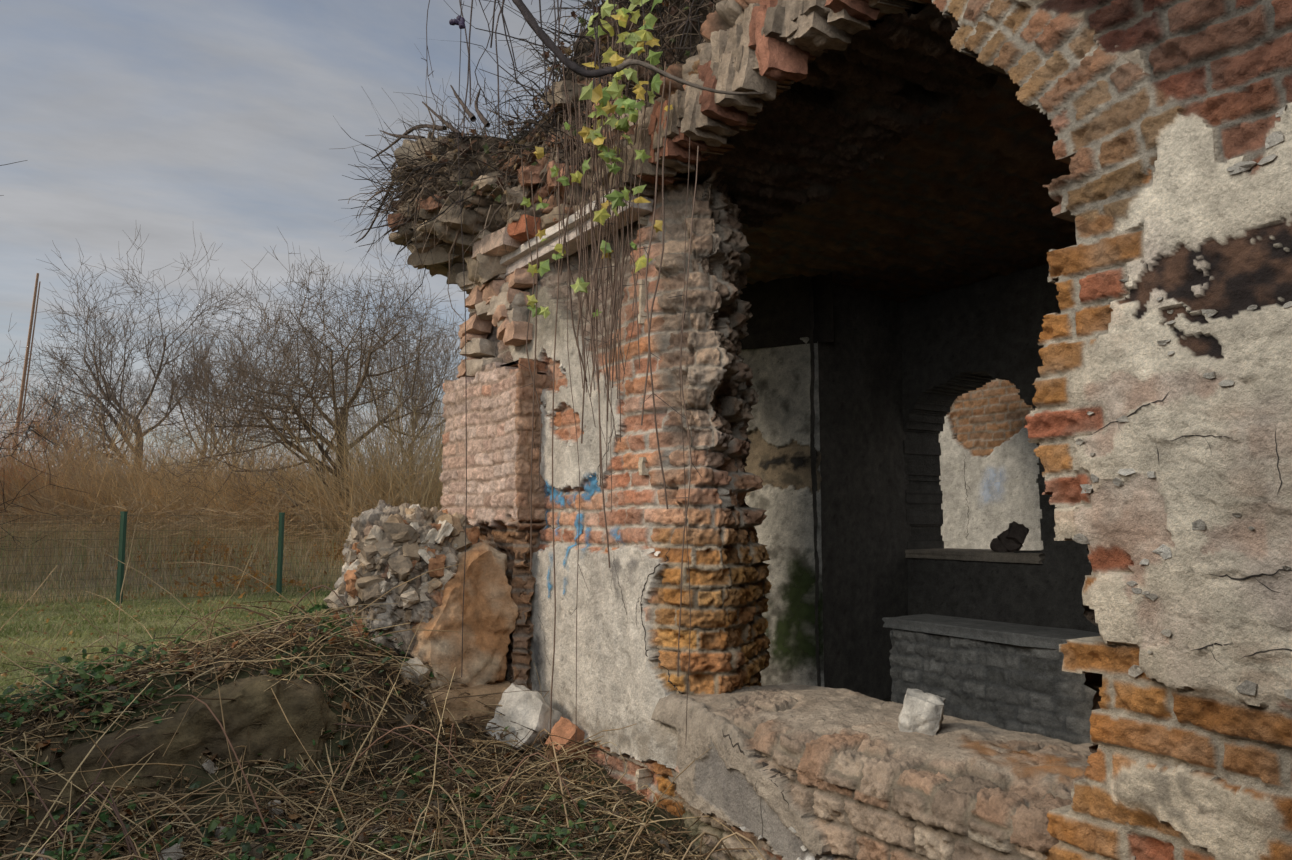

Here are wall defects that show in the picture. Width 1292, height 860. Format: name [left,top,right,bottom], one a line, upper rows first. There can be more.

spalling [1034,0,1292,175]
spalling [533,0,880,696]
spalling [947,378,1034,457]
flaking render [1076,213,1292,456]
spalling [1045,468,1292,860]
crack [1211,569,1292,594]
spalling [640,760,686,820]